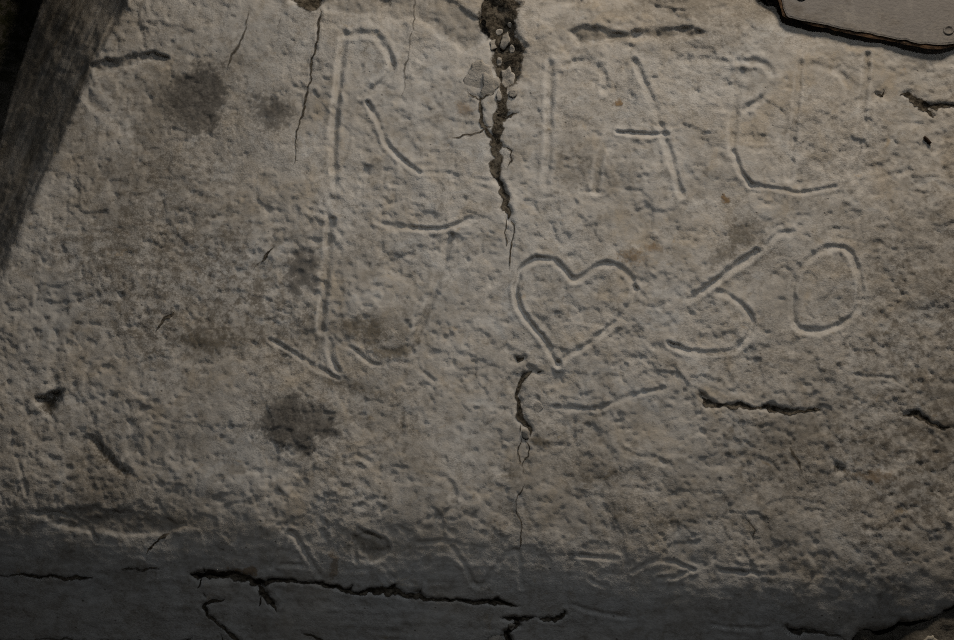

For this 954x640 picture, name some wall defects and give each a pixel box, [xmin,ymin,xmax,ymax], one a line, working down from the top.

crack [293,11,322,165]
crack [452,0,519,270]
crack [877,90,954,117]
crack [515,357,544,548]
crack [699,390,820,416]
crack [903,410,954,430]
crack [190,568,566,640]
crack [786,627,847,640]